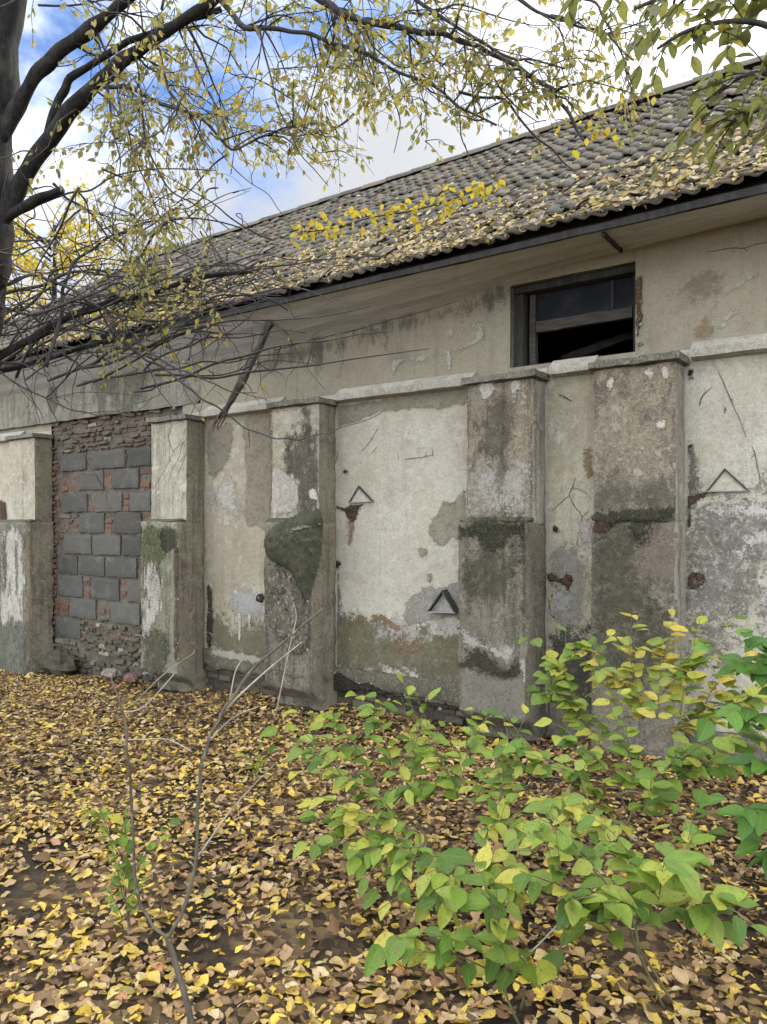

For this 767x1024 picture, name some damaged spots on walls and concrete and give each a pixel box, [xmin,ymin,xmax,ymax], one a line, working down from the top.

leakage [282,404,318,515]
rust [336,504,363,546]
flaking render [418,490,467,557]
crack [553,477,591,544]
flaking render [0,524,26,630]
flaking render [403,574,459,625]
rust [547,573,573,607]